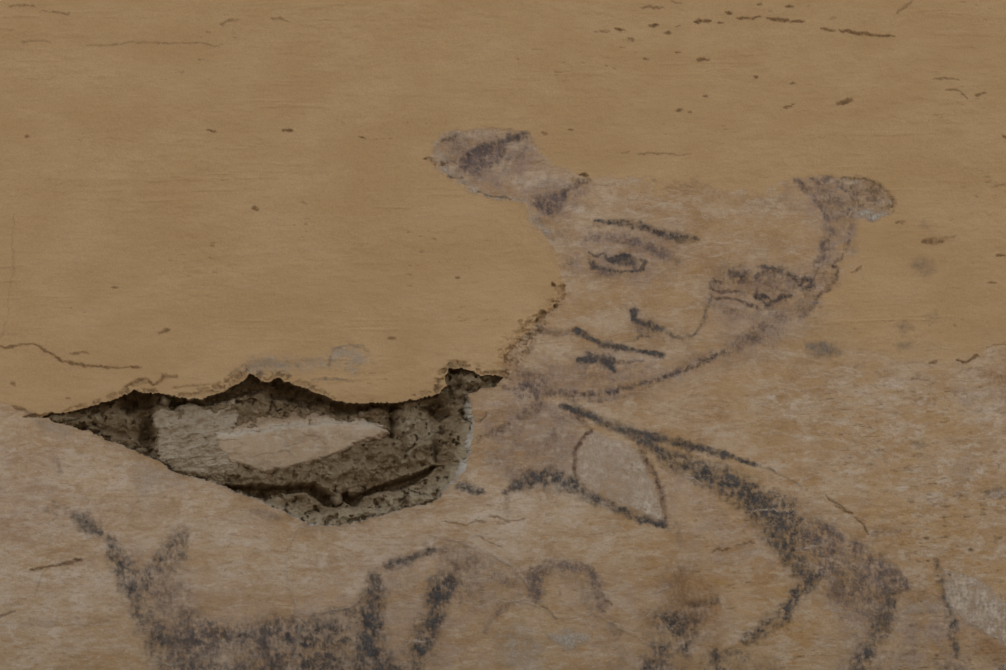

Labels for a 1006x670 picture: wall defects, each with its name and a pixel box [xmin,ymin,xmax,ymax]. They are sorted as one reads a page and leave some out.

spalling [42,368,504,526]